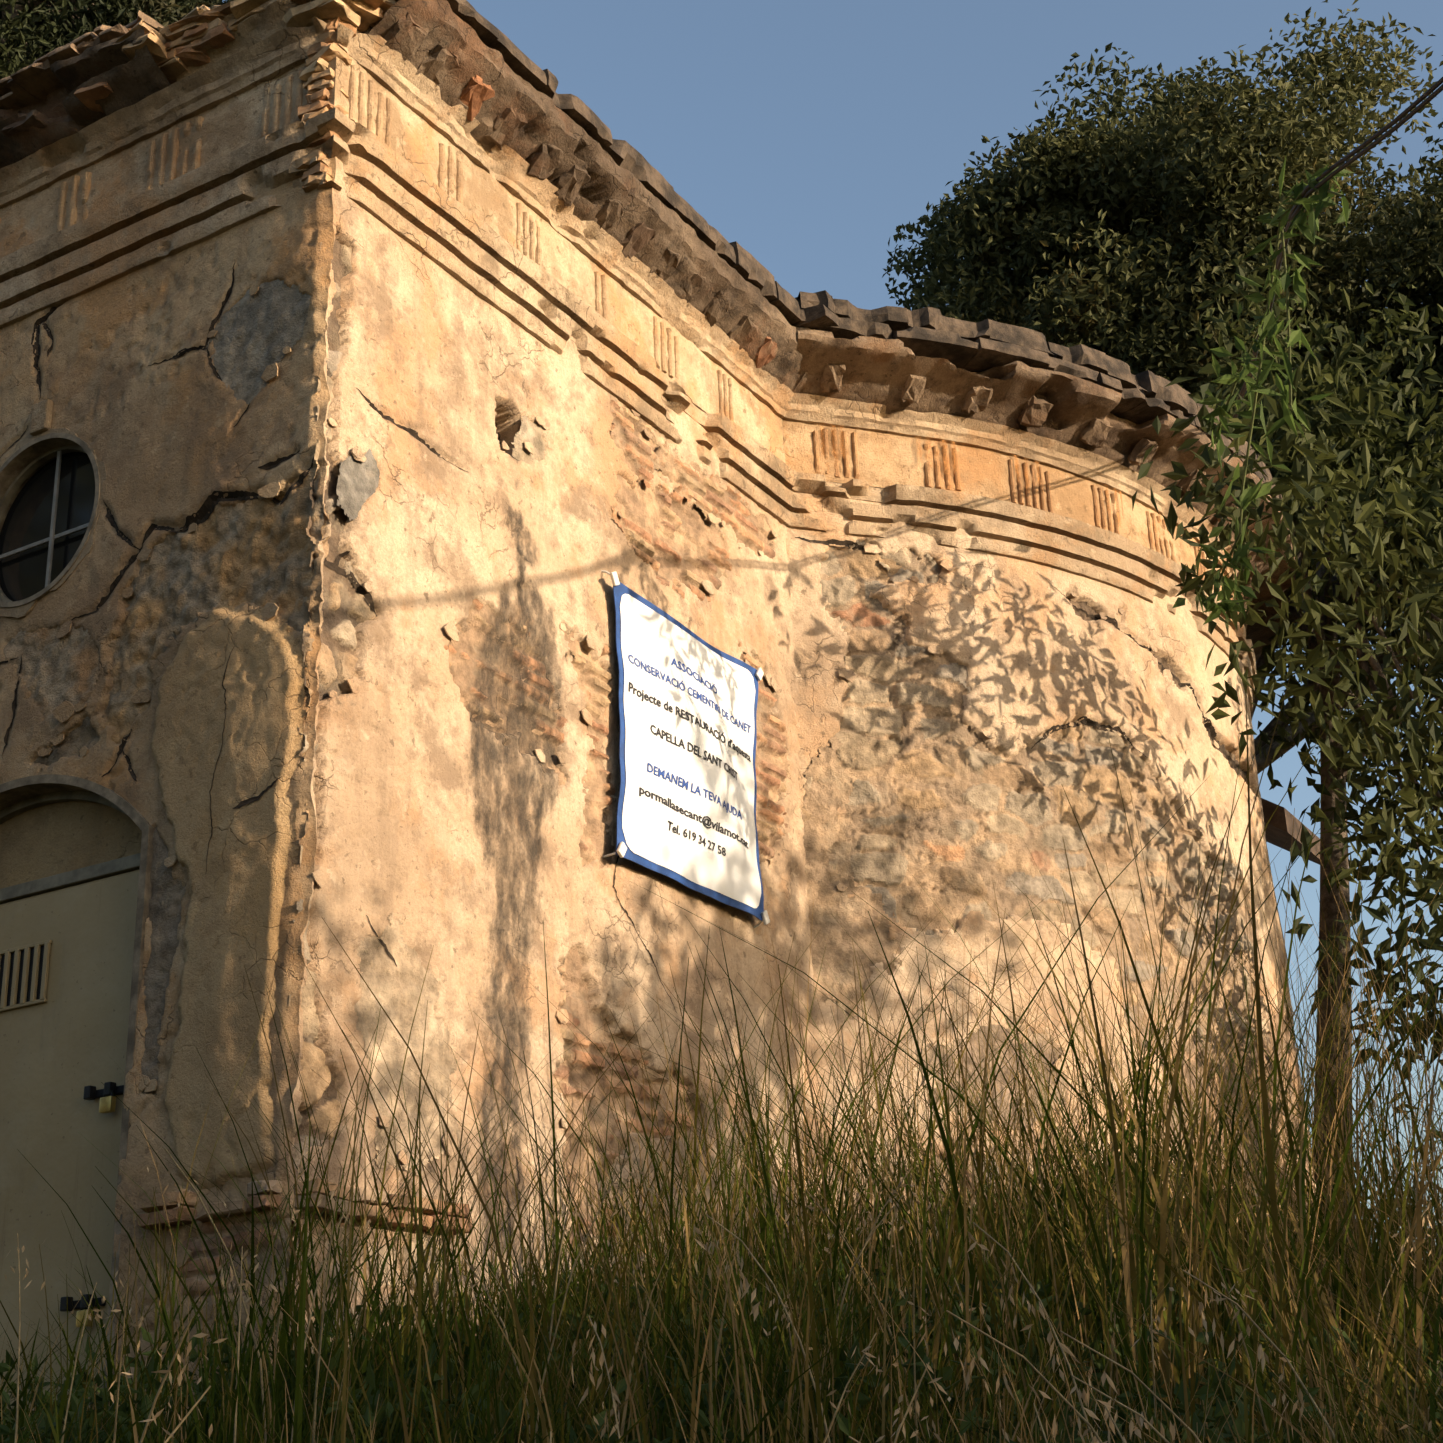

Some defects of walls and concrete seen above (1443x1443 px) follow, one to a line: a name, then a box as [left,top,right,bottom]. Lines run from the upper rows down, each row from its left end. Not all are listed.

crack [0,274,82,458]
crack [148,263,235,381]
spalling [3,238,380,889]
crack [71,450,314,621]
spalling [610,400,778,602]
crack [0,654,23,759]
crack [206,640,281,871]
water stain [469,511,561,1252]
spalling [443,599,616,869]
spalling [737,540,1313,1228]
flaking render [137,899,472,1339]
spalling [552,946,699,1249]